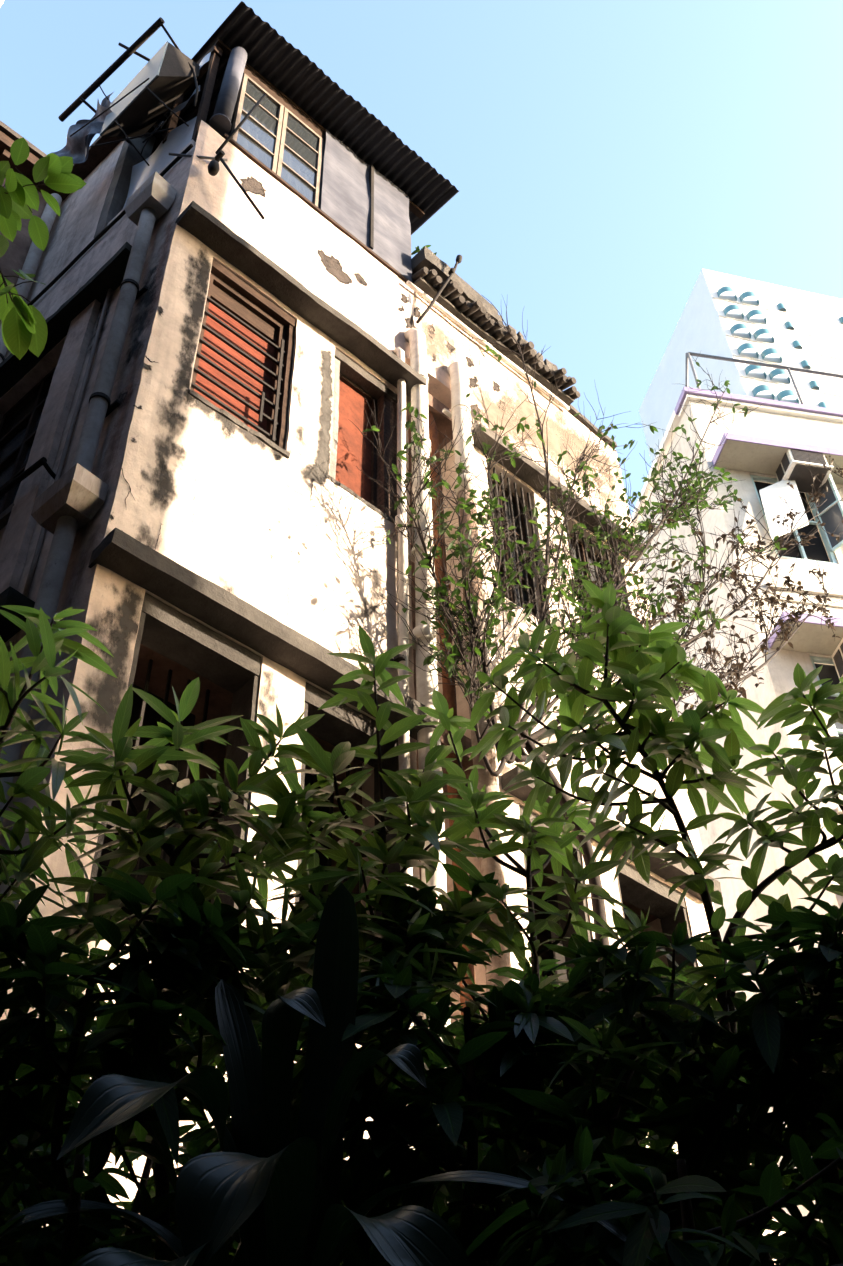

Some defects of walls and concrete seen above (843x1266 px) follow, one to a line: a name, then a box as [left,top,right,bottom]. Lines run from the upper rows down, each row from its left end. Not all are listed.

peeling [240,176,268,197]
flaking render [318,250,368,286]
leakage [141,250,305,509]
leakage [360,568,383,618]
leakage [80,584,143,772]